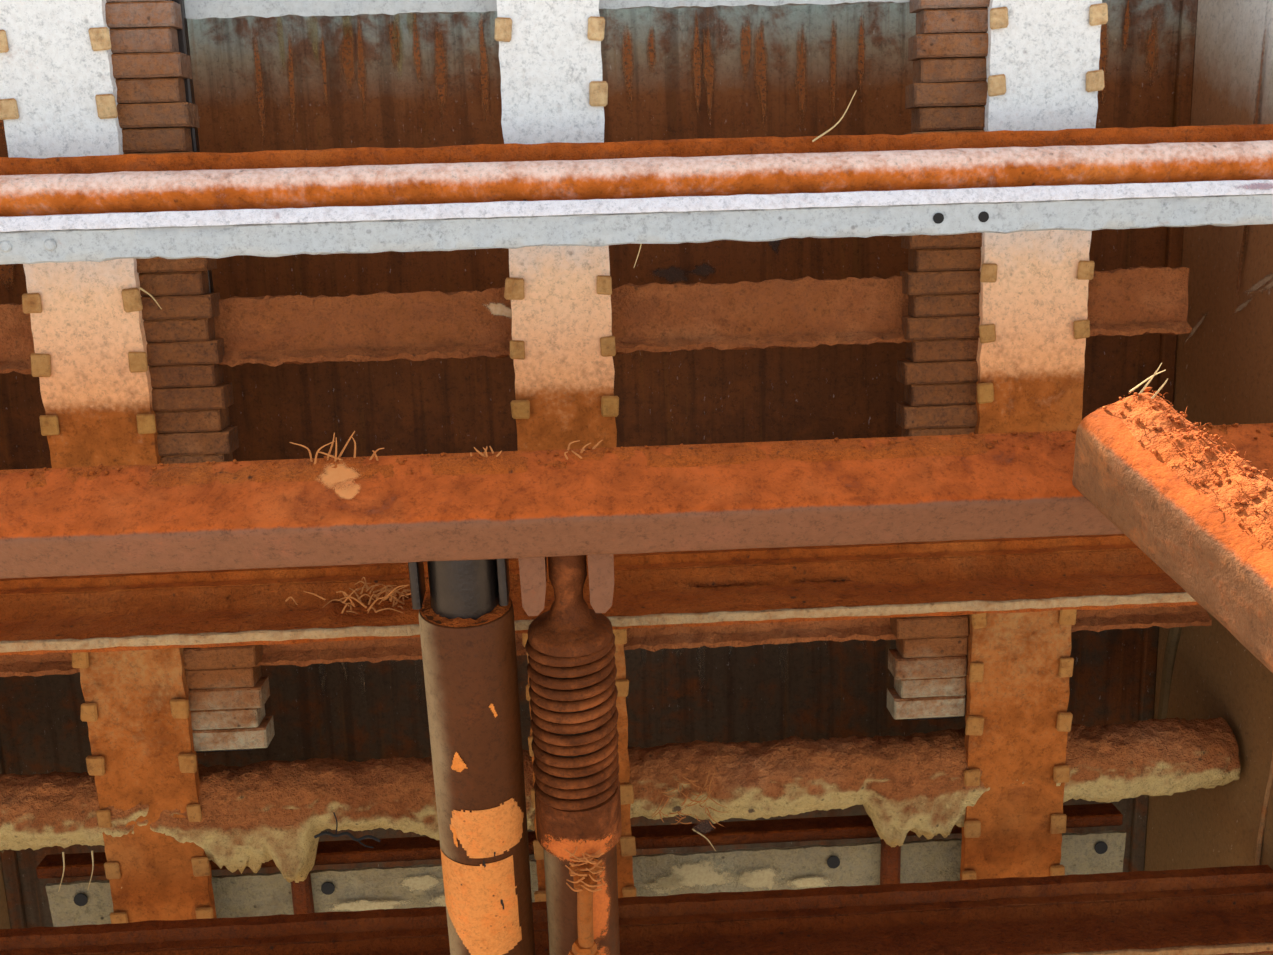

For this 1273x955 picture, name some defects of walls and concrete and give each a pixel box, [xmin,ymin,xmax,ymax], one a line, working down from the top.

peeling [321,464,359,499]
peeling [451,752,468,772]